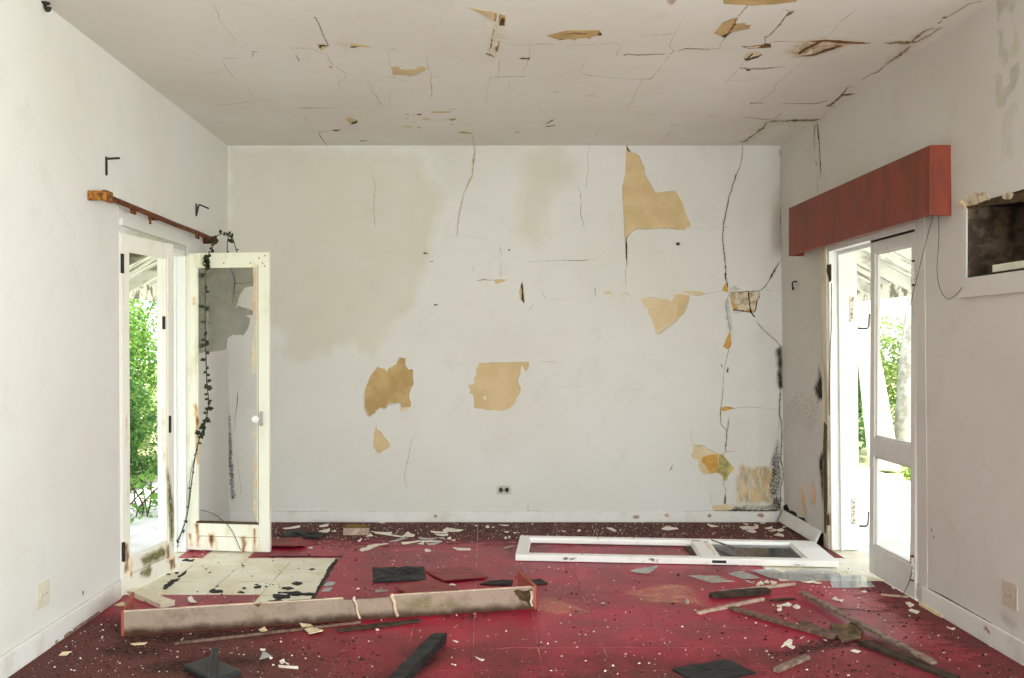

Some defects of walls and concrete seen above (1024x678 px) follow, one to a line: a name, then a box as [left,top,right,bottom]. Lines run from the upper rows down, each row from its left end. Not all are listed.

peeling [546,30,604,41]
peeling [714,0,797,39]
peeling [790,37,865,57]
crack [486,23,725,140]
crack [452,132,502,281]
peeling [620,145,691,267]
crack [706,1,981,509]
peeling [603,291,706,335]
spalling [722,281,761,317]
peeling [363,357,415,454]
peeling [468,360,530,411]